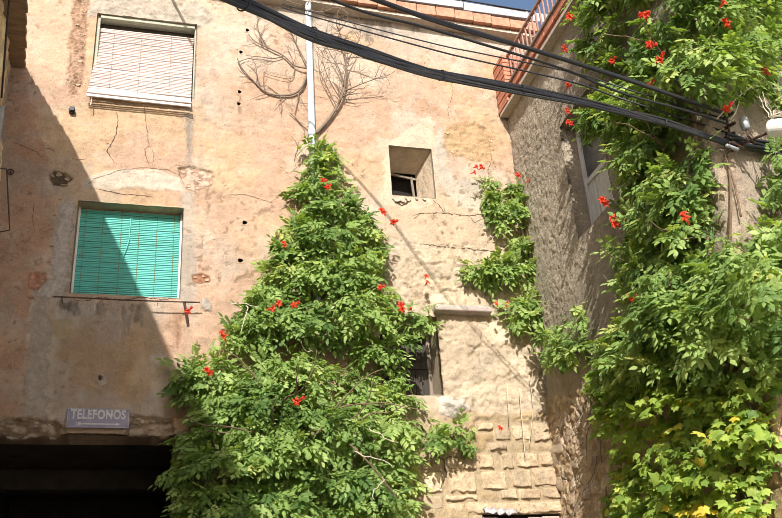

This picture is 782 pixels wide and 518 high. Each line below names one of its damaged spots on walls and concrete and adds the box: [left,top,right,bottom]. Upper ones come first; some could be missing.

crack [81,106,180,197]
spalling [49,171,71,186]
spalling [178,166,212,192]
spalling [0,416,61,440]
spalling [129,413,174,438]